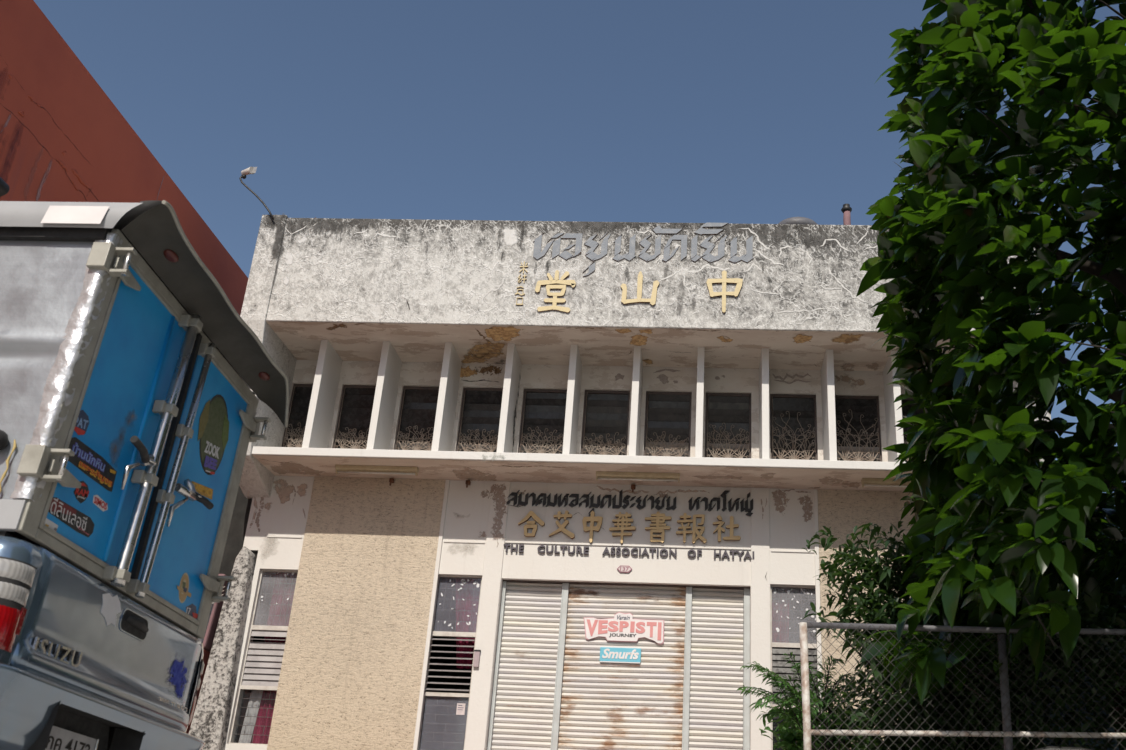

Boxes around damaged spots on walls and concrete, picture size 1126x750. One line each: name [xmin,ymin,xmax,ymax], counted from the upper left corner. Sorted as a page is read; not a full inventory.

crack [0,79,99,202]
leakage [570,221,889,257]
peeling [262,459,323,510]
peeling [453,465,532,547]
peeling [761,473,860,522]